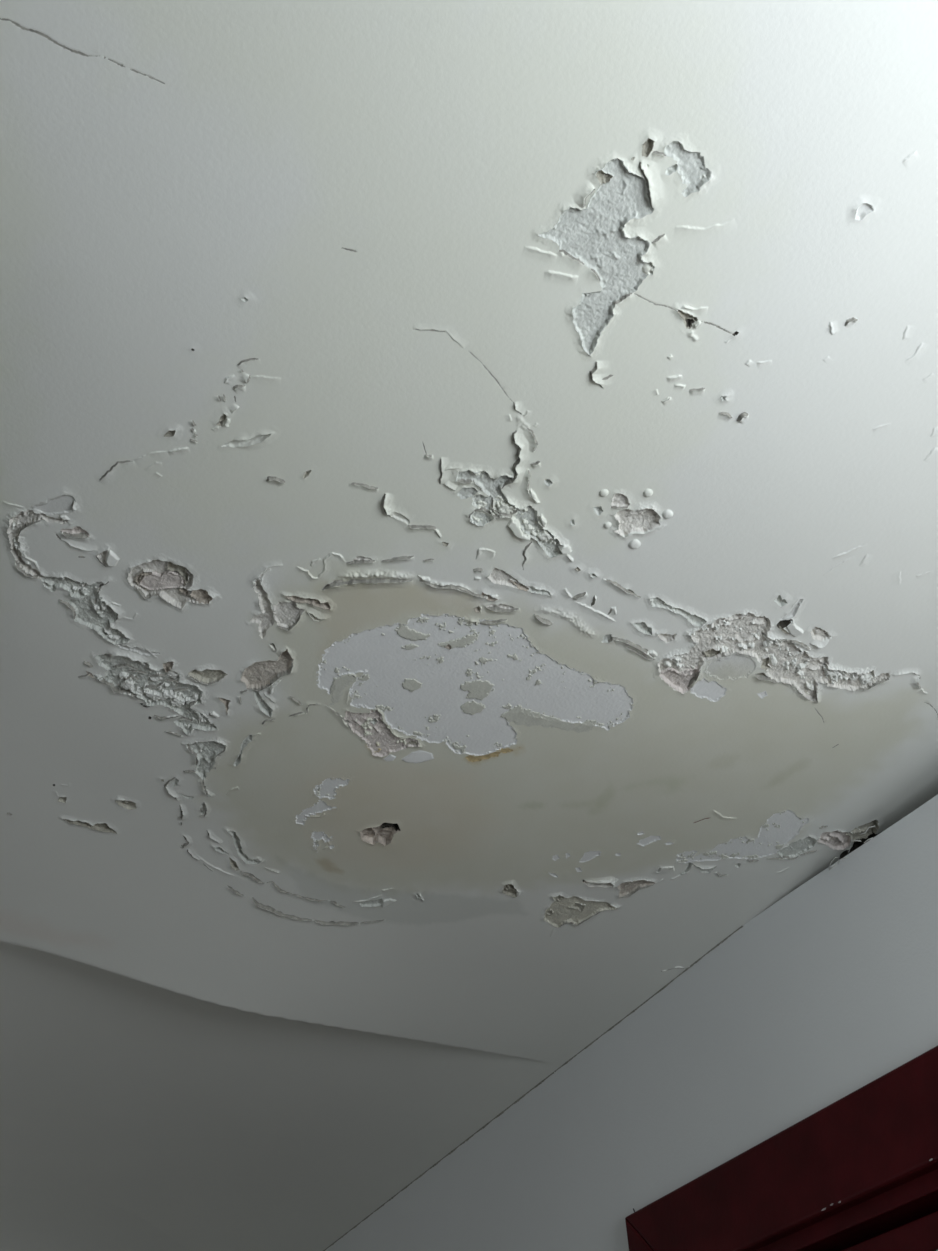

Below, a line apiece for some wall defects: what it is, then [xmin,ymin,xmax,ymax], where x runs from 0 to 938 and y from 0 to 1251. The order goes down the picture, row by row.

crack [0,18,165,84]
peeling [525,129,732,388]
crack [634,293,743,344]
peeling [0,402,928,937]
water stain [190,559,938,928]